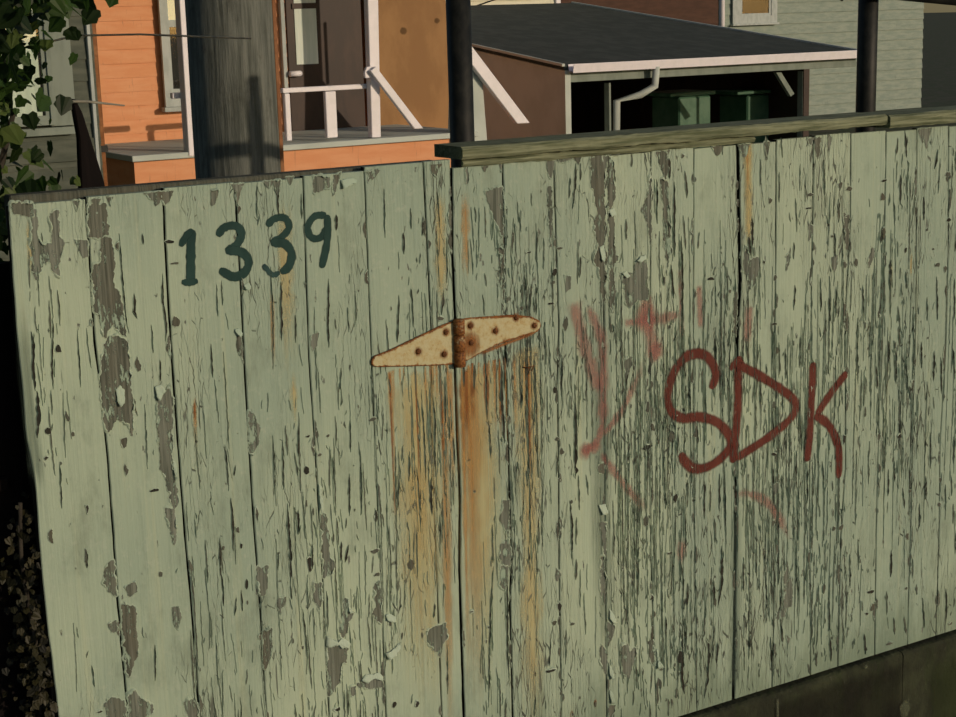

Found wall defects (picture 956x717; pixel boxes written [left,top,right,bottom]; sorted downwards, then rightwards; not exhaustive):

peeling [8,195,142,449]
peeling [483,185,507,309]
peeling [546,150,673,313]
peeling [149,383,180,546]
corrosion [388,314,537,658]
peeling [96,558,155,717]
peeling [183,696,200,717]
peeling [325,597,385,712]
peeling [425,621,449,658]